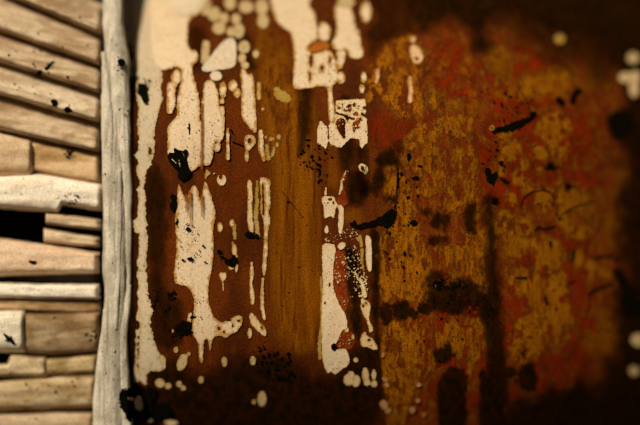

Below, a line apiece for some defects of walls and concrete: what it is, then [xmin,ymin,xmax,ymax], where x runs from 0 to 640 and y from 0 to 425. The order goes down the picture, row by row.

rust [308,41,330,53]
peeling [131,0,372,391]
peeling [252,391,267,407]
rust [261,65,320,349]
peeling [317,171,389,388]
rust [417,303,488,406]
rust [475,48,602,209]